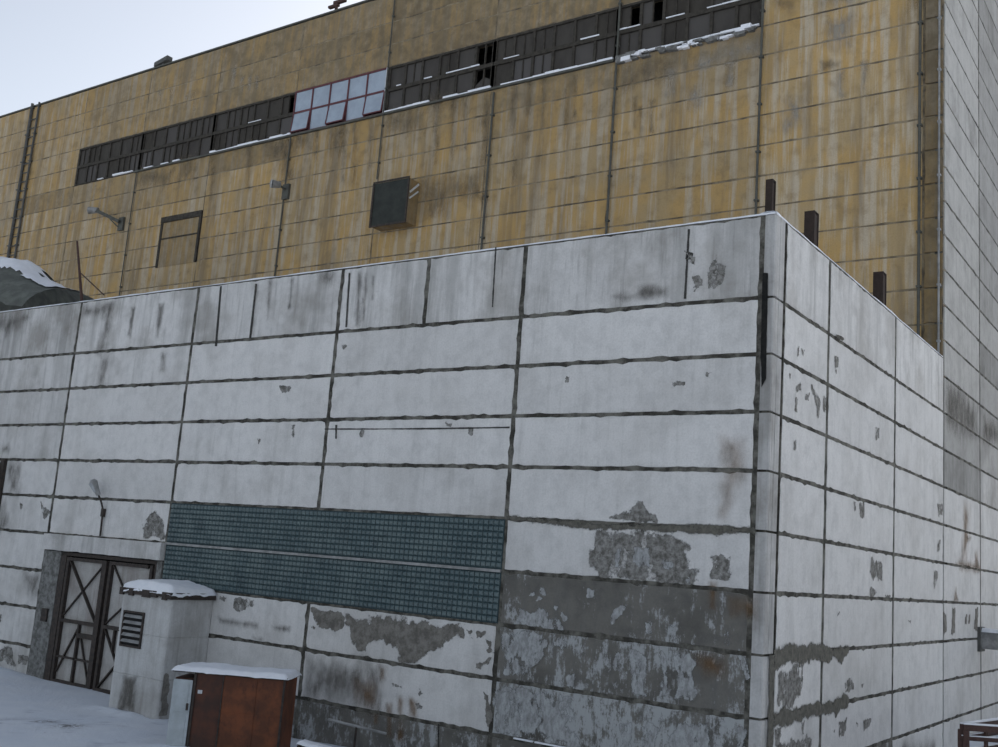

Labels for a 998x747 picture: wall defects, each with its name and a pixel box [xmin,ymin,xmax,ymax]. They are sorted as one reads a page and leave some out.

peeling [686,252,726,292]
peeling [790,374,826,418]
peeling [143,511,165,540]
peeling [589,501,731,587]
peeling [870,557,891,598]
peeling [0,646,28,667]
spalling [311,607,494,669]
peeling [659,651,698,701]
peeling [777,663,804,709]
peeling [483,689,522,737]
peeling [775,720,812,747]